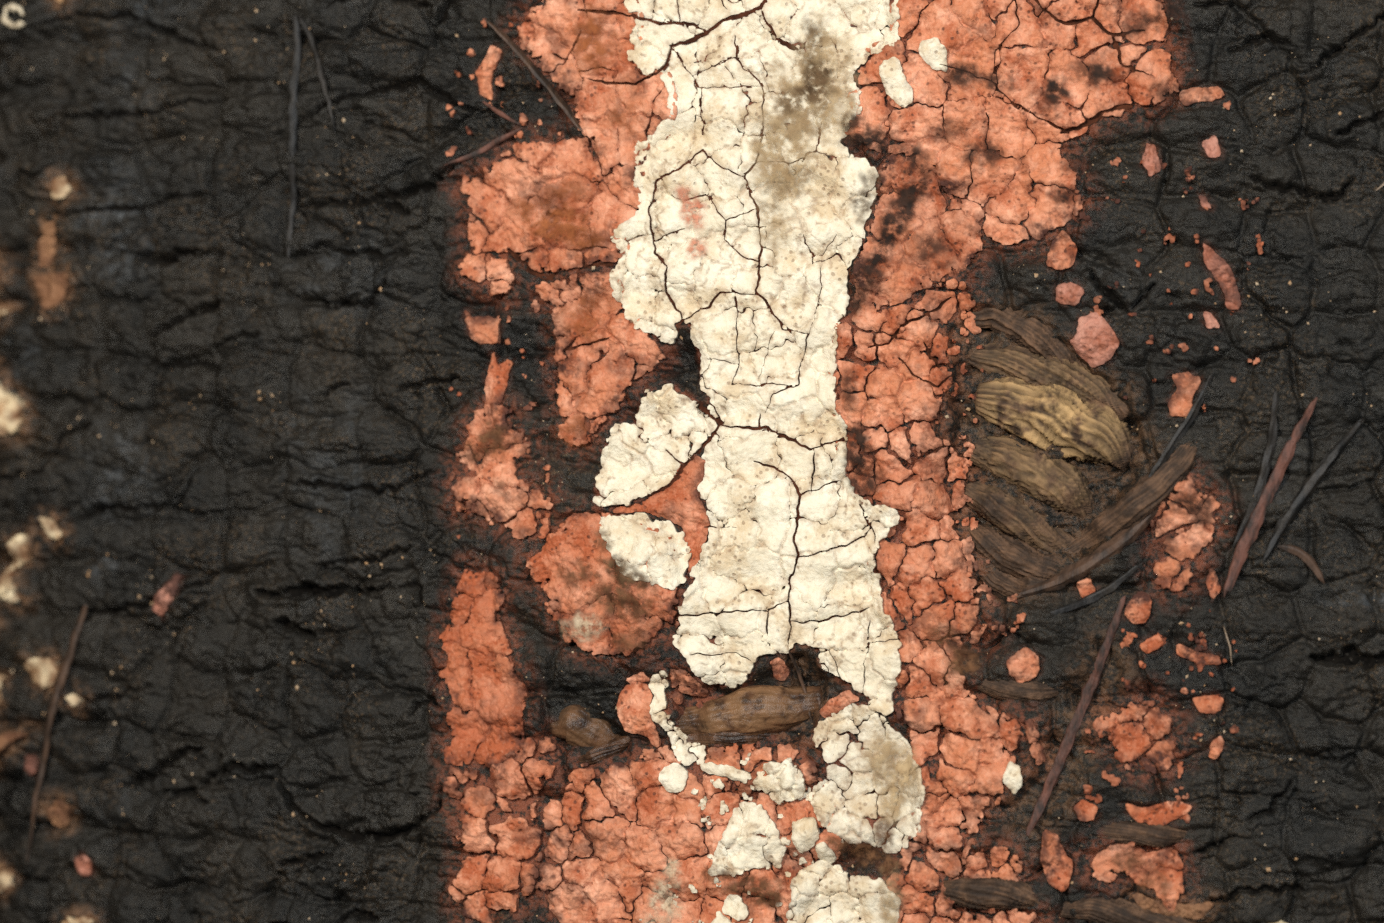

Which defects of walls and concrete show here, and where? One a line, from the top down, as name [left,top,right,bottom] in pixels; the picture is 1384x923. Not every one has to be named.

crack [944,0,1148,134]
peeling [32,222,71,309]
crack [508,249,613,282]
crack [1089,269,1156,313]
peeling [1185,234,1264,329]
crack [554,0,900,684]
crack [869,297,954,388]
peeling [0,383,27,436]
peeling [439,0,1239,923]
peeling [0,534,34,604]
peeling [39,517,65,540]
peeling [24,658,60,688]